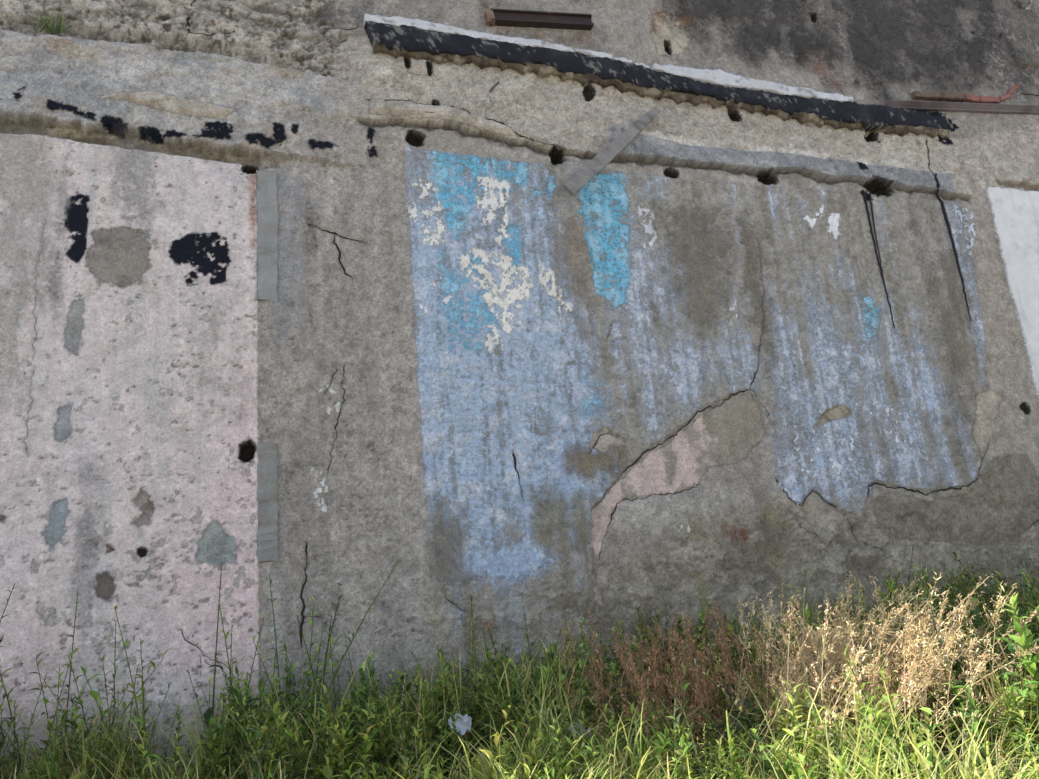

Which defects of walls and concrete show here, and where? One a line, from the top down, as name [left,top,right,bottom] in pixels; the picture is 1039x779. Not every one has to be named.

leakage [664,0,1024,100]
crack [307,223,365,278]
peeling [407,178,450,245]
peeling [458,176,573,354]
crack [324,365,345,470]
crack [591,243,769,562]
spalling [793,405,856,483]
spalling [563,392,766,612]
crack [300,543,321,646]